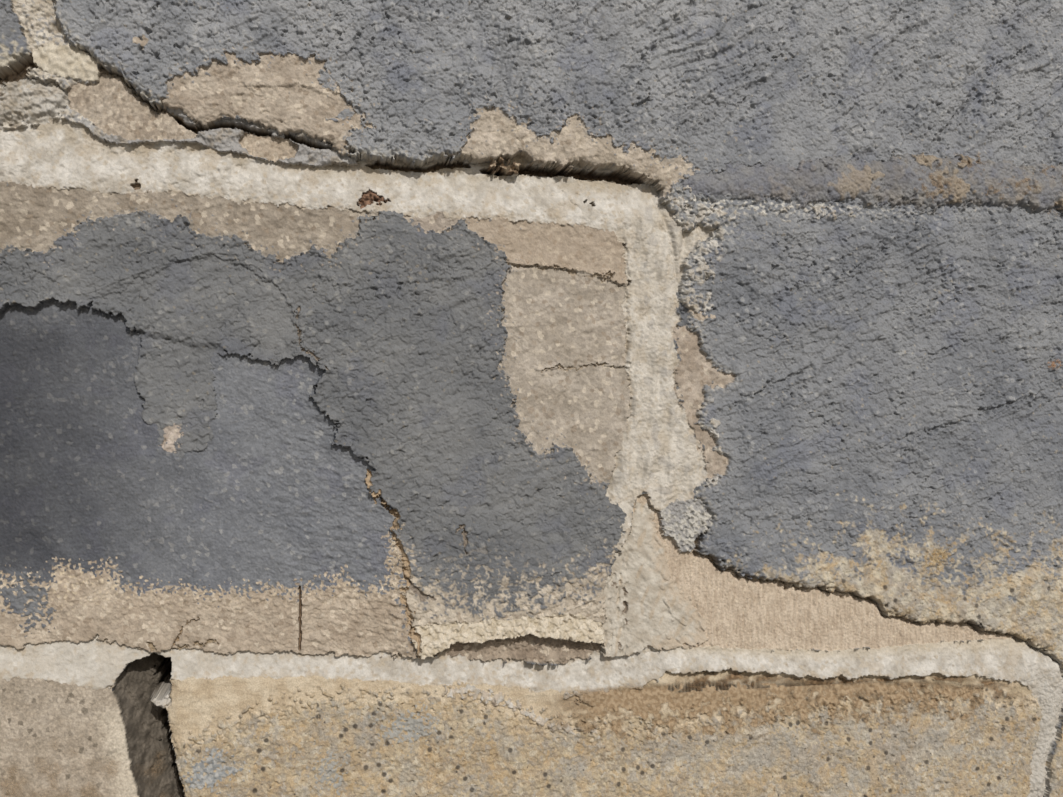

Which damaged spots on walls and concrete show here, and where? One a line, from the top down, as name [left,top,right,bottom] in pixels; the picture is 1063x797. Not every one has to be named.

flaking render [0,0,374,168]
crack [172,116,333,150]
crack [369,155,647,185]
peeling [457,107,696,198]
peeling [0,180,391,263]
crack [294,306,328,370]
peeling [403,212,632,485]
peeling [159,424,188,454]
crack [365,469,441,658]
crack [455,524,468,555]
peeling [0,494,1031,666]
crack [113,617,220,797]